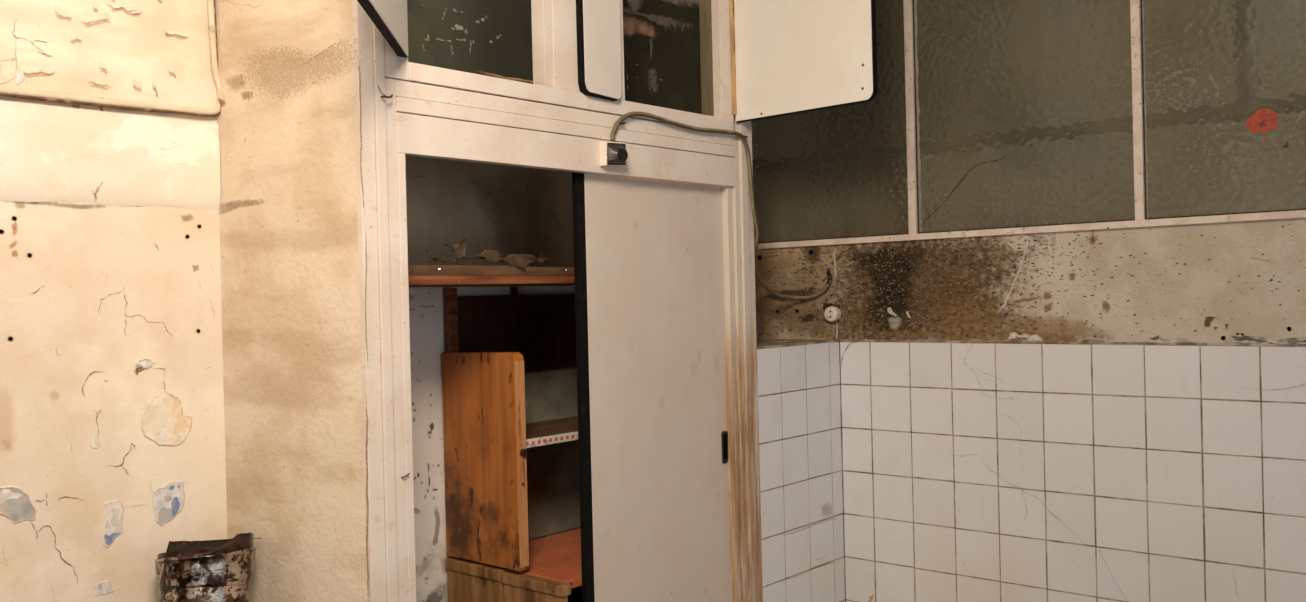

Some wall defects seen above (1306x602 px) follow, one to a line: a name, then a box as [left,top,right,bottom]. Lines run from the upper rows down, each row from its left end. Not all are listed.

crack [98,292,172,335]
leakage [755,232,1147,342]
spalling [141,389,192,447]
crack [67,371,186,525]
peeling [0,485,37,524]
crack [1,494,83,597]
peeling [102,499,124,548]
peeling [151,480,185,527]
peeling [414,463,440,545]